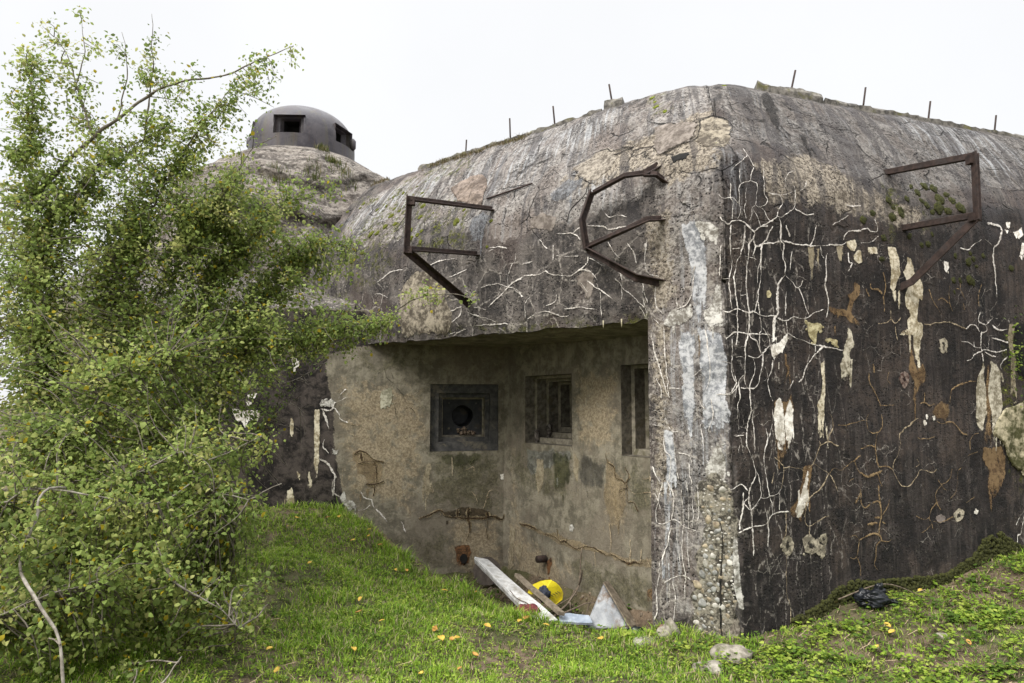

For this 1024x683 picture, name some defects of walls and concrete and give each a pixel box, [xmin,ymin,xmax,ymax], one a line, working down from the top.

water stain [1004,222,1024,259]
crack [319,96,1008,636]
water stain [664,221,731,464]
water stain [771,321,789,369]
water stain [773,398,794,450]
water stain [817,362,828,445]
water stain [840,328,854,387]
water stain [836,240,923,368]
rust [909,349,926,419]
rust [982,365,1006,511]
water stain [976,324,1017,448]
water stain [795,471,809,518]